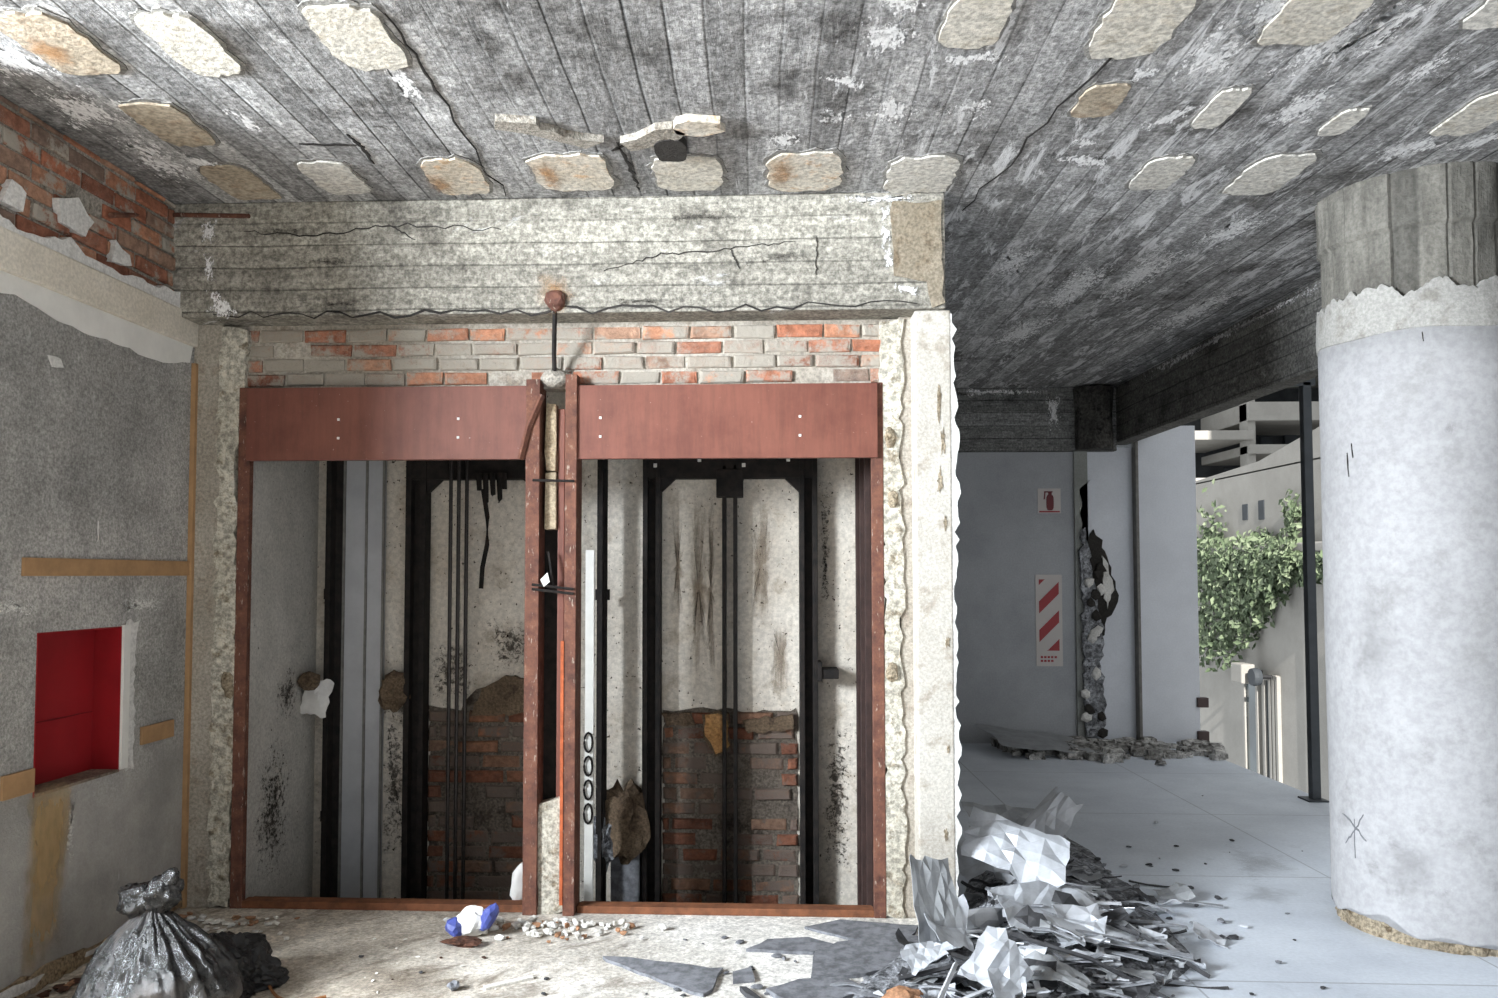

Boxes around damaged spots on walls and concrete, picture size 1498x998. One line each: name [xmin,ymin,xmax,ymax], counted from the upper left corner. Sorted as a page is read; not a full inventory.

spalling [0,5,128,77]
spalling [128,7,246,78]
spalling [297,0,413,72]
spalling [936,0,1017,51]
spalling [1083,0,1202,60]
spalling [1250,0,1378,48]
spalling [1458,0,1498,30]
crack [244,13,506,240]
flaking render [0,96,180,308]
spalling [522,151,620,192]
spalling [762,147,849,193]
spalling [1078,480,1119,739]